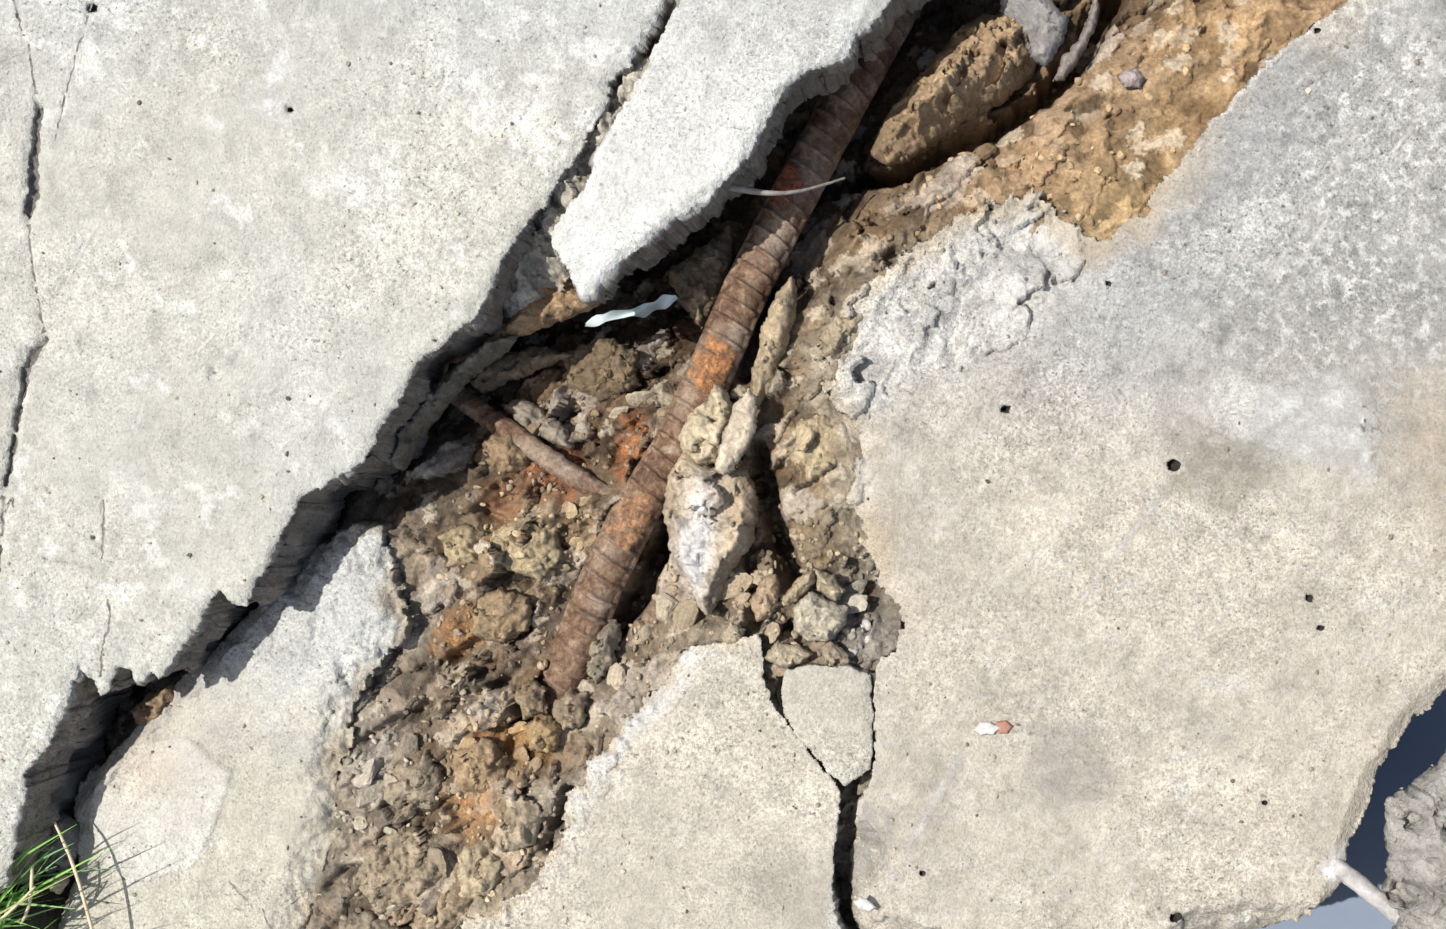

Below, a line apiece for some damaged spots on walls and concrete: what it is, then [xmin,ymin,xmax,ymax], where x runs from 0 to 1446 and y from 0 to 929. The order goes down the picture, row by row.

crack [502,0,679,318]
corrosion [769,164,804,207]
crack [0,0,94,571]
corrosion [688,334,736,394]
crack [98,500,106,561]
corrosion [488,462,575,509]
corrosion [606,493,652,551]
spalling [305,0,1347,929]
crack [99,599,111,676]
spalling [102,670,188,763]
corrosion [514,717,543,756]
crack [777,673,876,796]